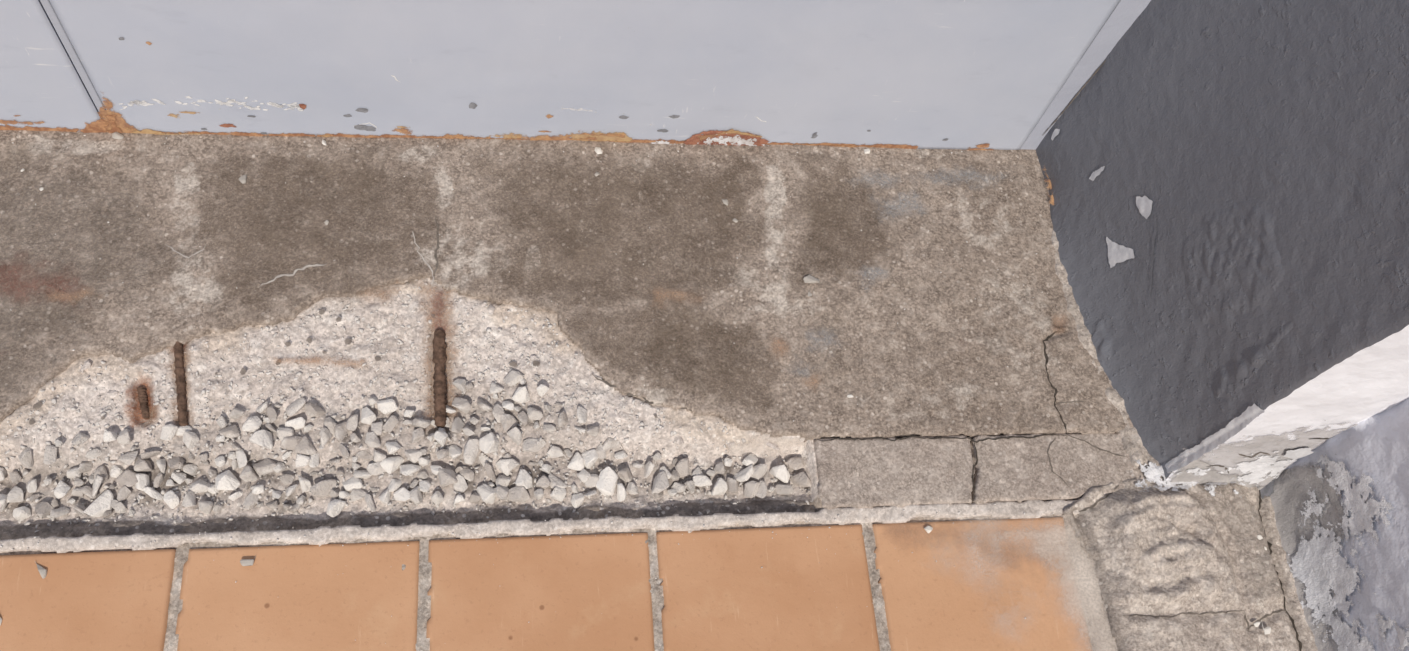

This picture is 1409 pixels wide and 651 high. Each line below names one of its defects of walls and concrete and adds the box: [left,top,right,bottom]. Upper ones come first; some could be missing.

corrosion [0,98,686,144]
corrosion [126,381,156,426]
water stain [201,158,437,304]
spalling [0,278,824,540]
corrosion [425,287,455,426]
water stain [481,155,776,412]
crack [819,331,1126,512]
peeling [1106,237,1134,268]
peeling [1136,196,1153,219]
crack [1122,438,1330,651]
peeling [1165,403,1409,651]